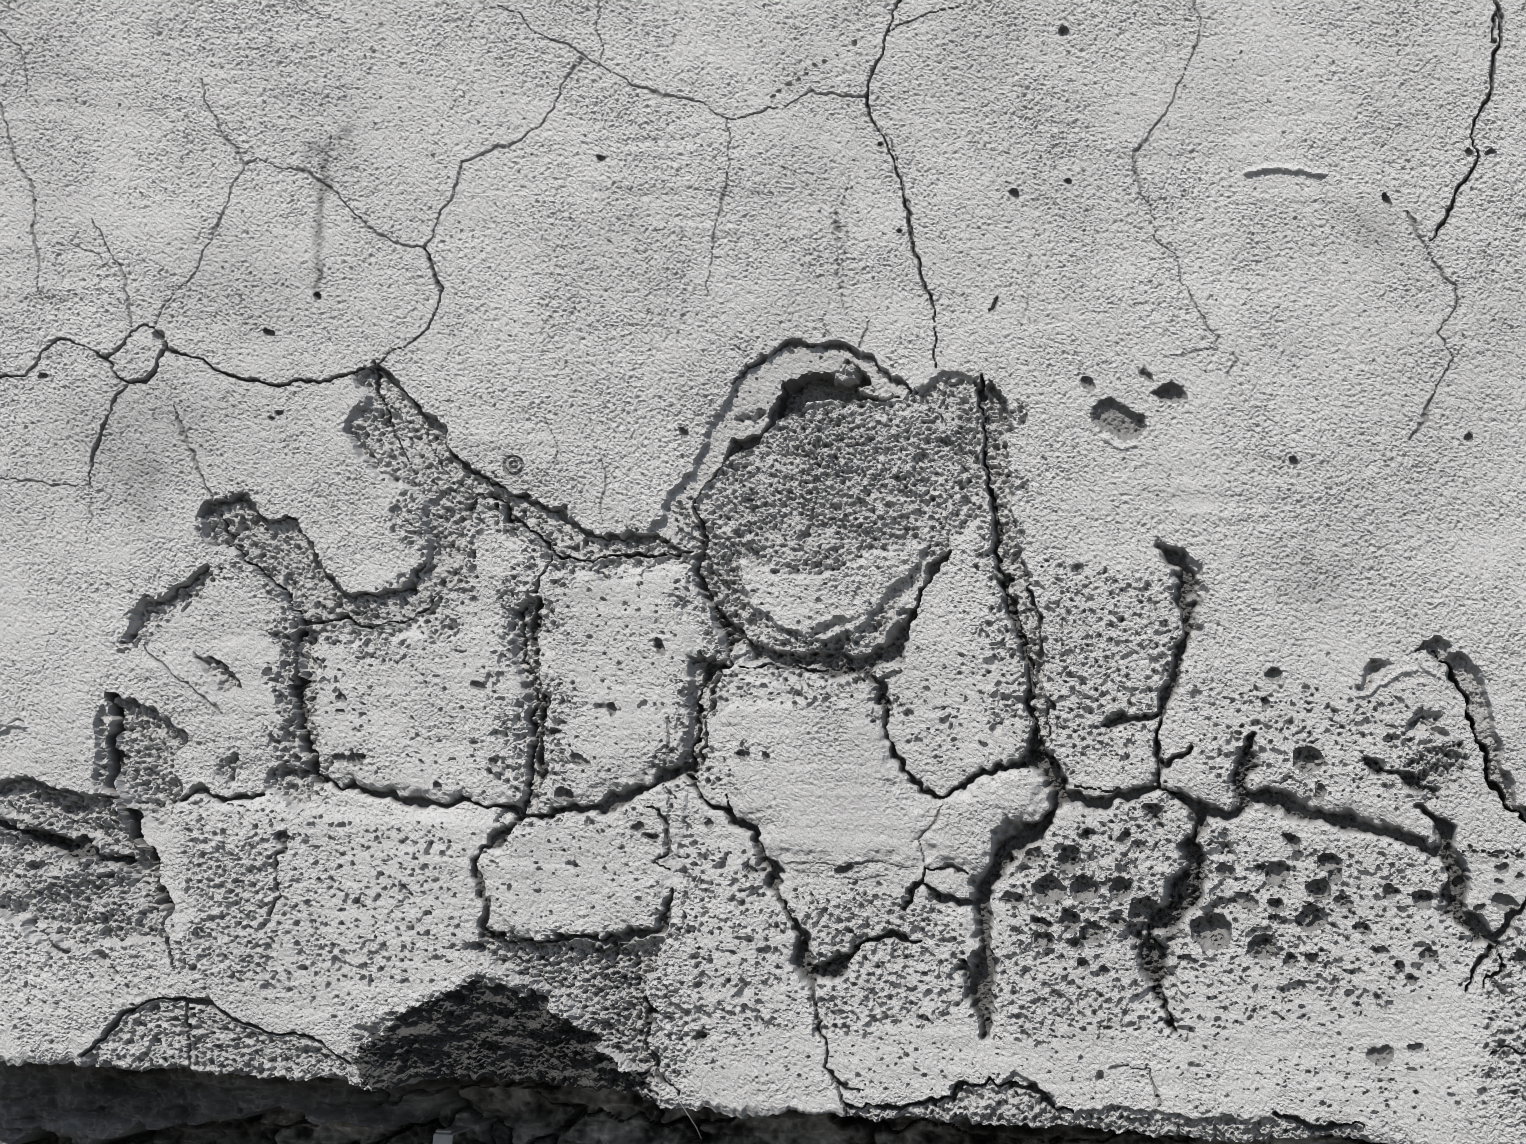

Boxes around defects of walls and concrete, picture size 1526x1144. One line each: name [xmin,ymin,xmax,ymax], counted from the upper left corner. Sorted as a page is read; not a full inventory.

crack [0,0,959,549]
crack [1130,0,1240,378]
crack [1405,0,1505,442]
flaking render [119,338,1057,828]
flaking render [0,692,189,978]
crack [100,692,266,972]
crack [265,830,292,918]
flaking render [457,887,681,1097]
crack [275,539,1526,1117]
flaking render [995,803,1178,992]
flaking render [842,1069,1372,1143]
flaking render [1177,830,1449,997]